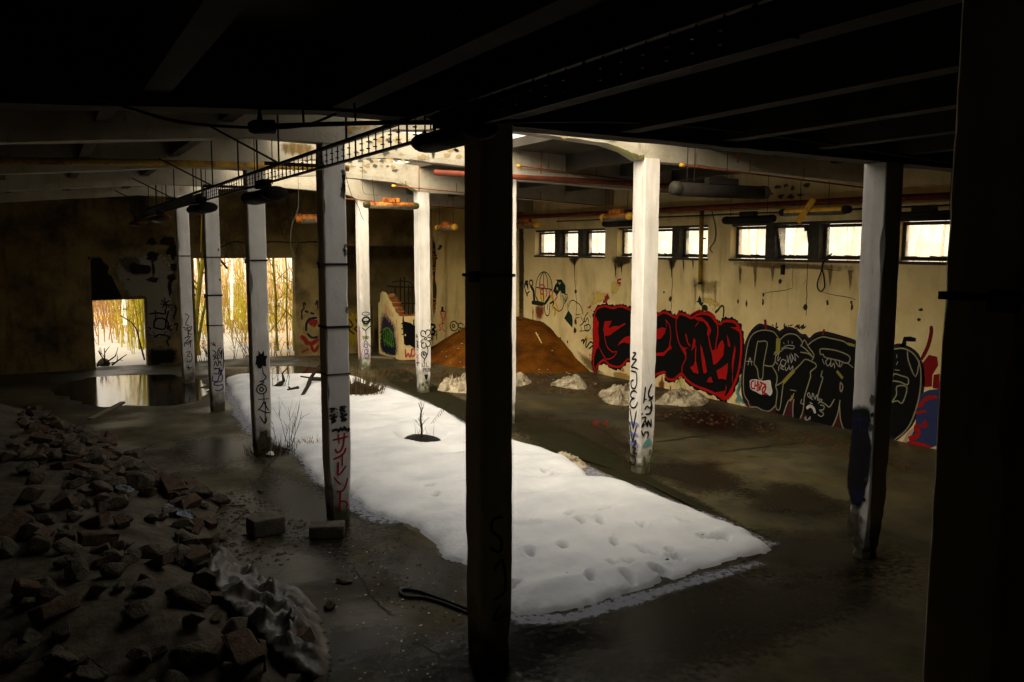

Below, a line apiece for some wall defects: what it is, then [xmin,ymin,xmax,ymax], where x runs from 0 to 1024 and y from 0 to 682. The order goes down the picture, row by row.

spalling [341,120,426,199]
water stain [613,258,630,277]
water stain [739,261,852,286]